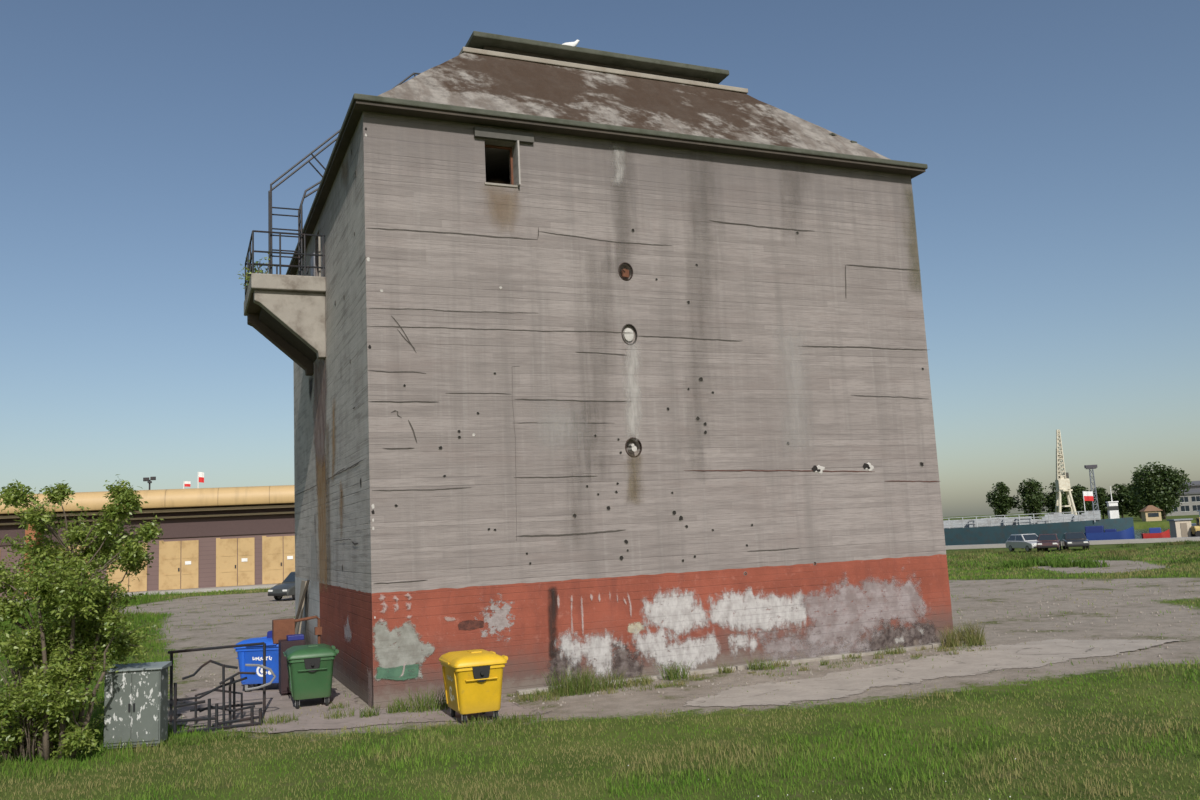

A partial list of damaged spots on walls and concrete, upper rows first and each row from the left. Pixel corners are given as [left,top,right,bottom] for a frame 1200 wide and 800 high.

damp [628,348,639,434]
corrosion [313,359,342,586]
peeling [373,616,435,681]
peeling [445,594,515,639]
peeling [547,571,936,686]